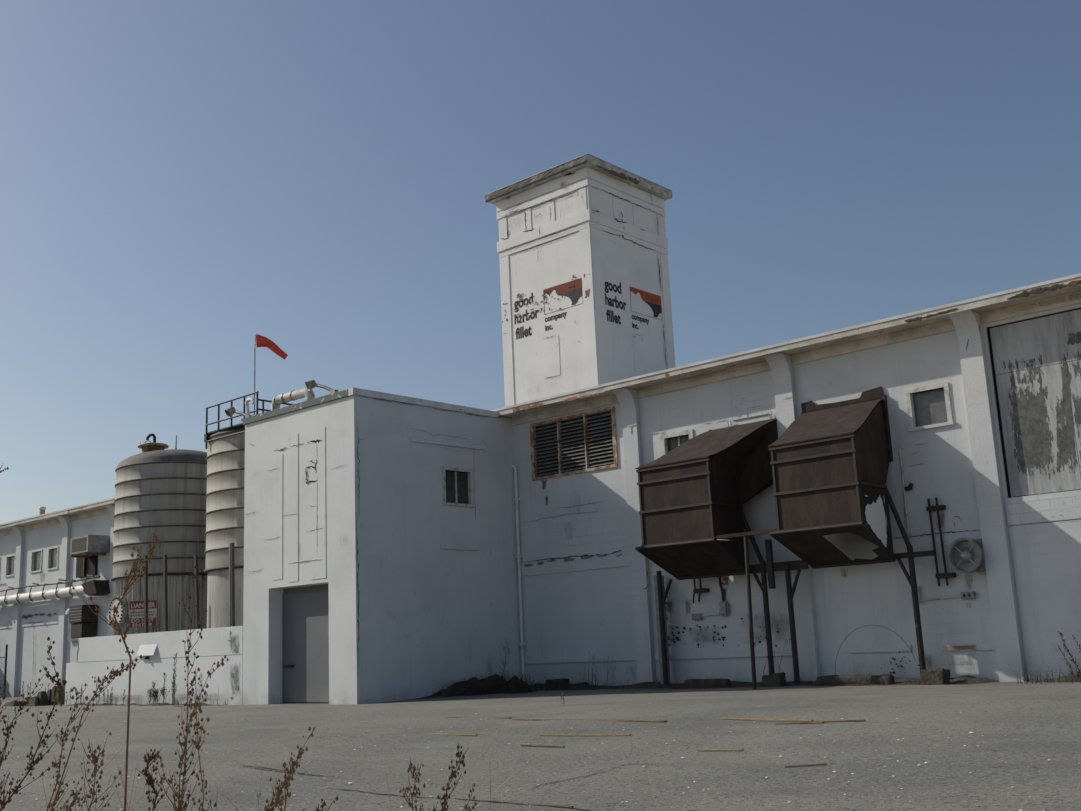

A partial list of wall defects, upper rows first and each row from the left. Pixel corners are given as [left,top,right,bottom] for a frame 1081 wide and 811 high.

spalling [1007,280,1081,300]
spalling [905,308,958,322]
peeling [1003,331,1081,479]
peeling [865,495,887,547]
peeling [668,624,726,648]